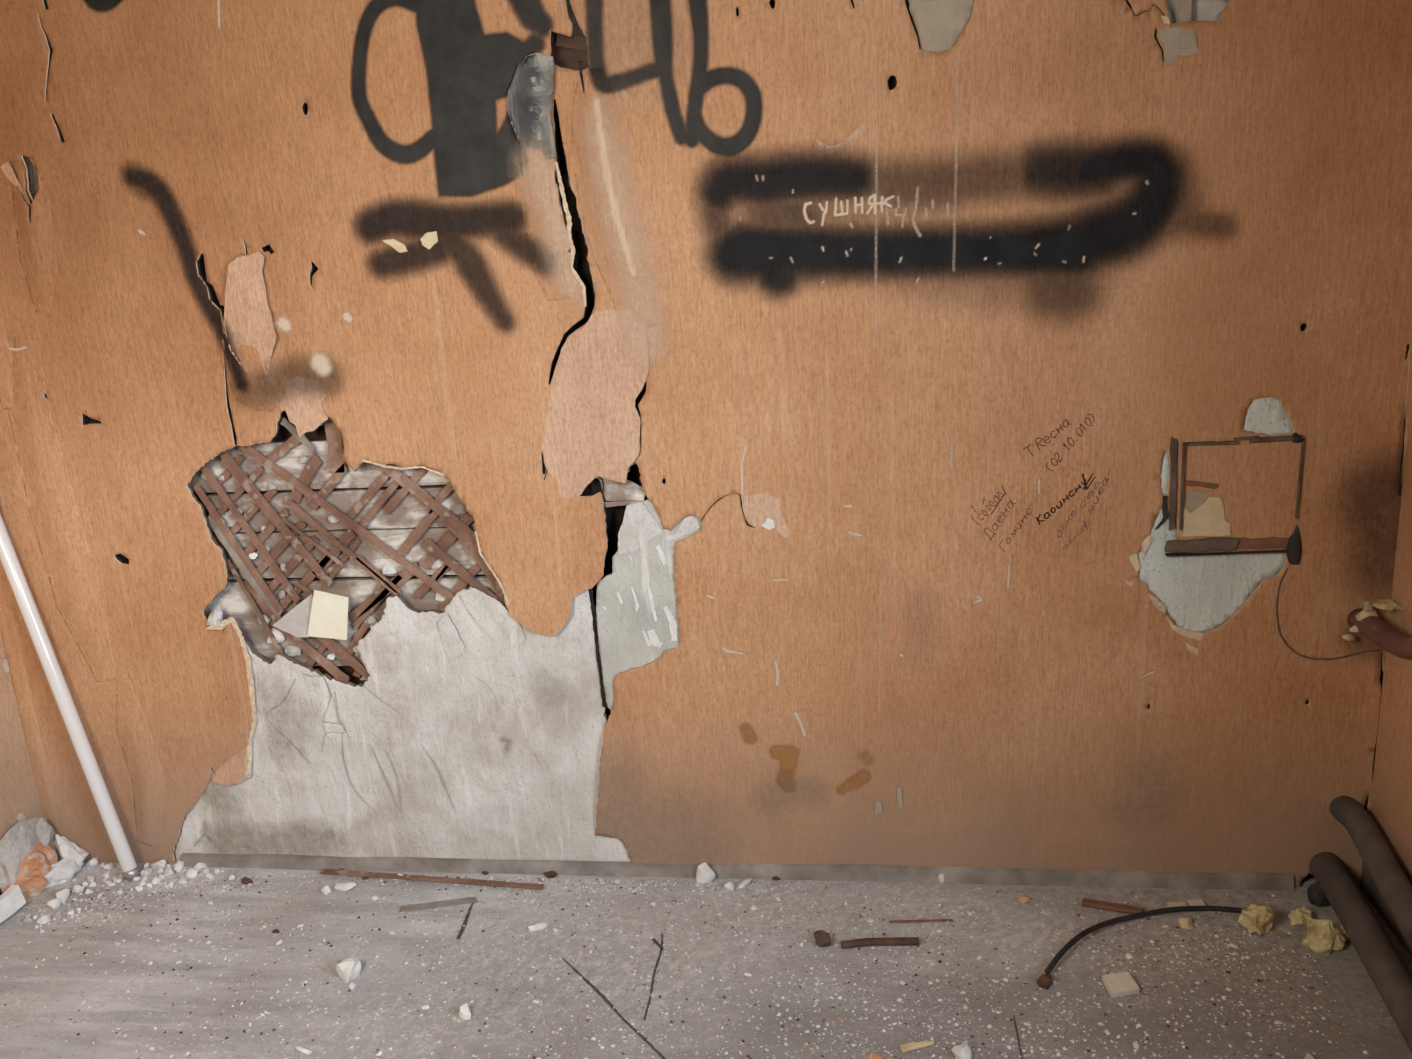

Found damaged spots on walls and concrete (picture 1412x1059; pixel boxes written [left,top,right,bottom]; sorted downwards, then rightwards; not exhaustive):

peeling [905,0,974,52]
spalling [1126,0,1230,66]
crack [548,0,595,385]
peeling [175,53,704,862]
crack [541,382,648,707]
peeling [1126,449,1284,657]
peeling [1243,396,1294,435]
spalling [0,817,89,900]